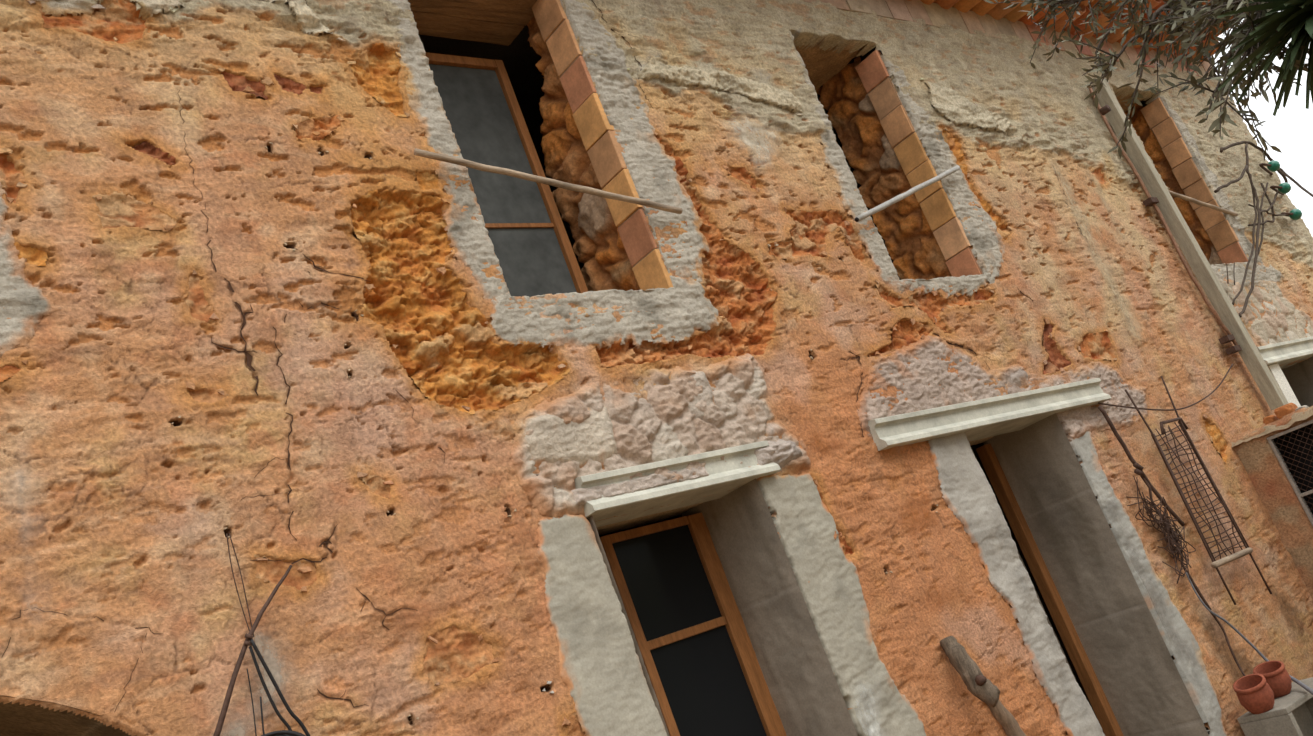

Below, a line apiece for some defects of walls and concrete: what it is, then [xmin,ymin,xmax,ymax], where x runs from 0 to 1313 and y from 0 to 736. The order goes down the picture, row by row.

crack [178,90,371,567]
flaking render [351,189,570,415]
flaking render [596,132,865,368]